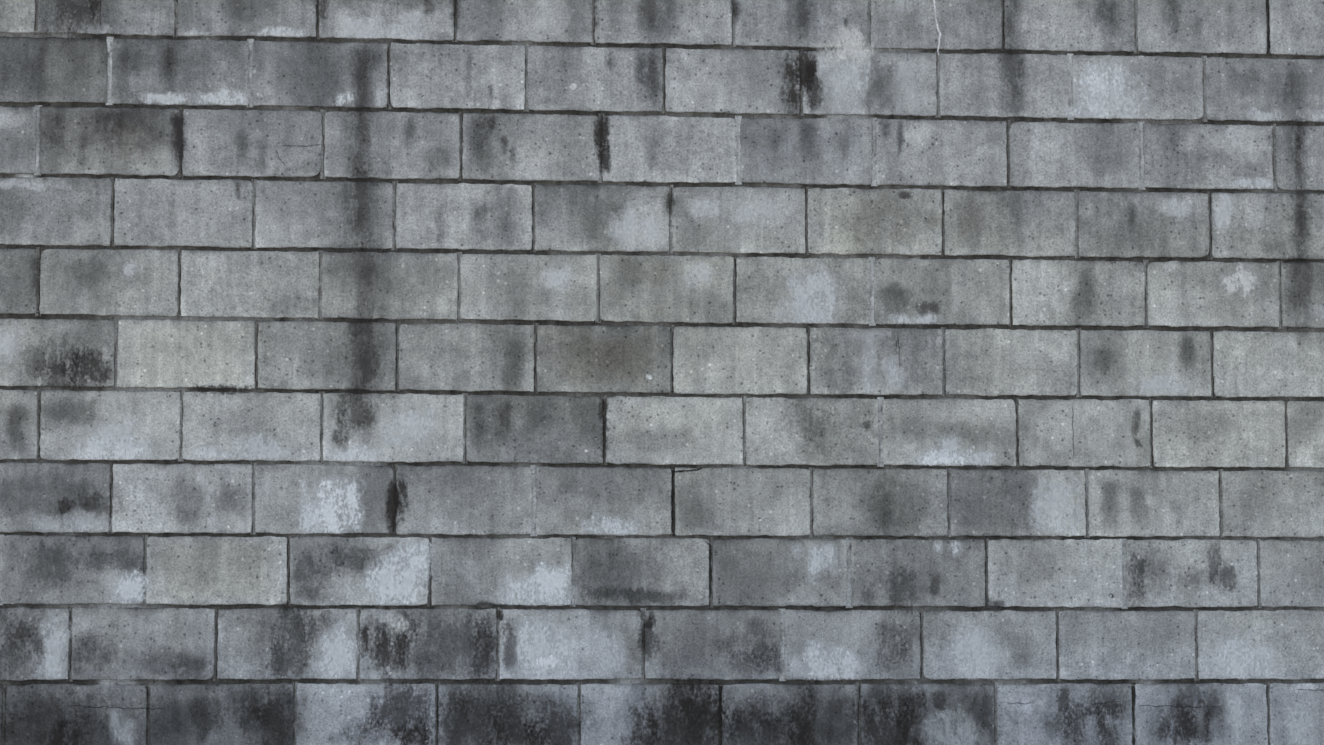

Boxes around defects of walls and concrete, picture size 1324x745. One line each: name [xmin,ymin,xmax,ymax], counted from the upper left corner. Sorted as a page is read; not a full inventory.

water stain [781,20,874,113]
water stain [594,117,610,172]
water stain [70,353,109,387]
water stain [497,562,574,620]
water stain [42,624,68,676]
water stain [509,621,574,679]
water stain [791,641,860,680]
water stain [1217,637,1272,679]
water stain [641,679,726,745]
water stain [863,693,945,745]
water stain [1064,704,1122,745]
water stain [1292,684,1315,692]